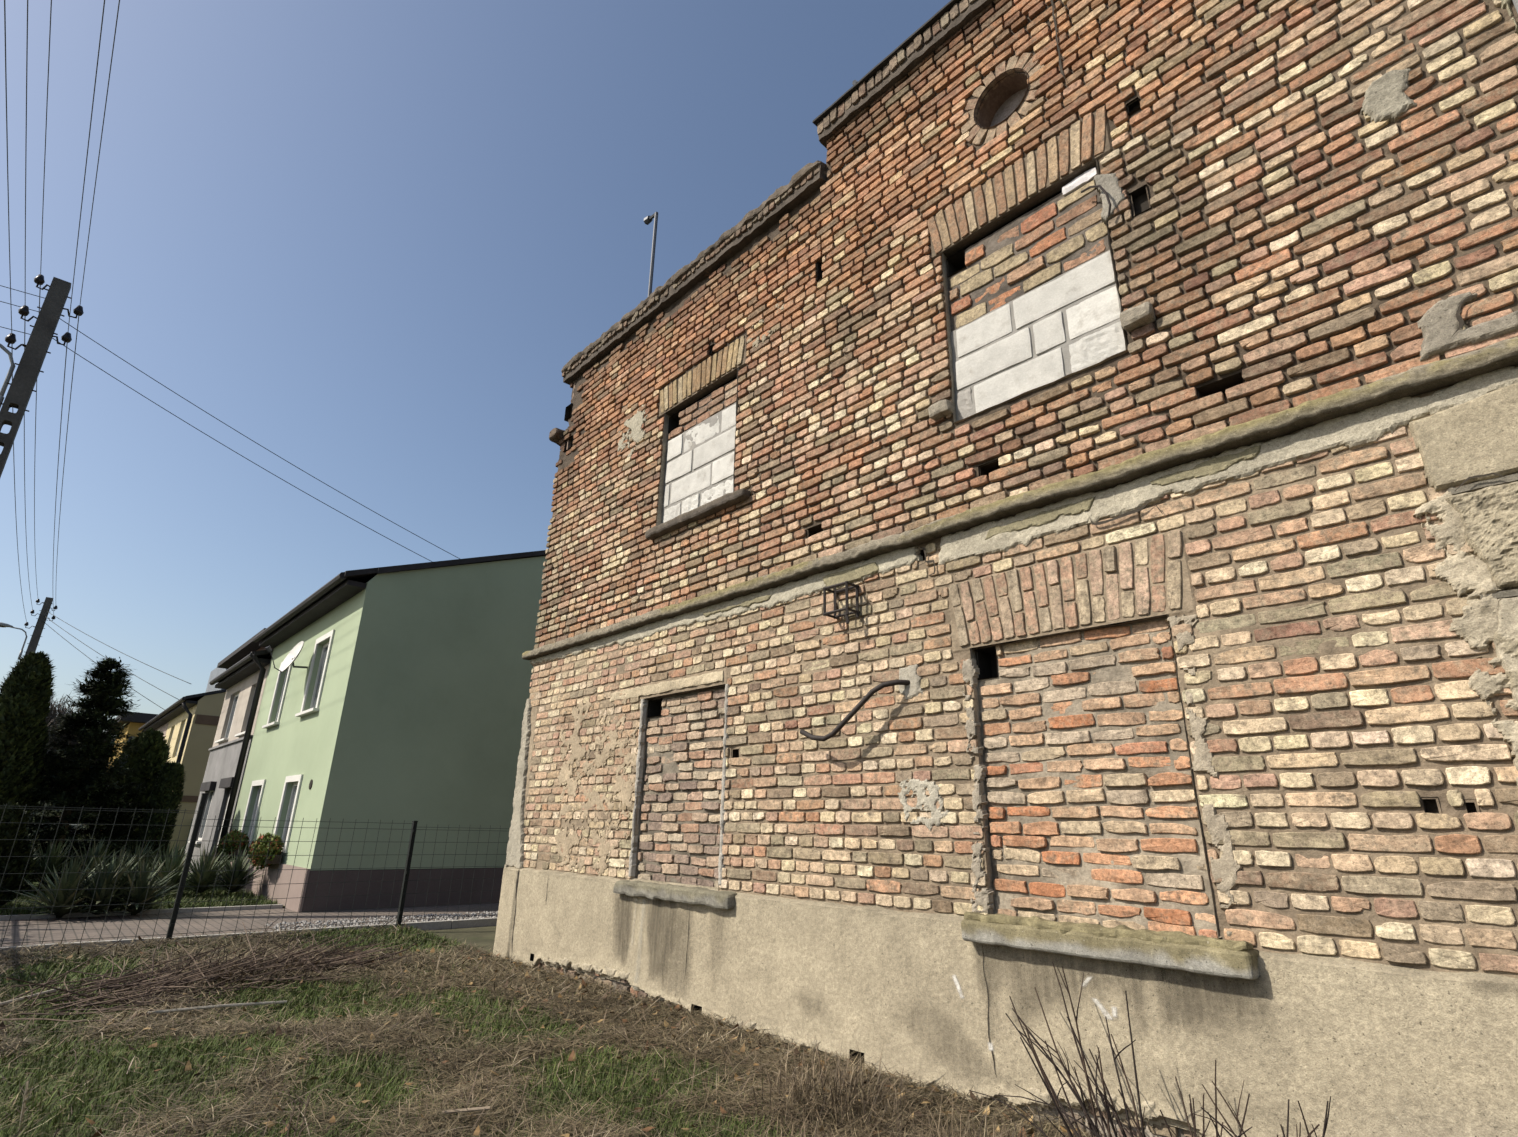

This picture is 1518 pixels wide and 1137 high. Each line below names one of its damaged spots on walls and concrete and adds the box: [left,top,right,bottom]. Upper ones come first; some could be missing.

peeling [530,366,1518,665]
leakage [617,896,671,983]